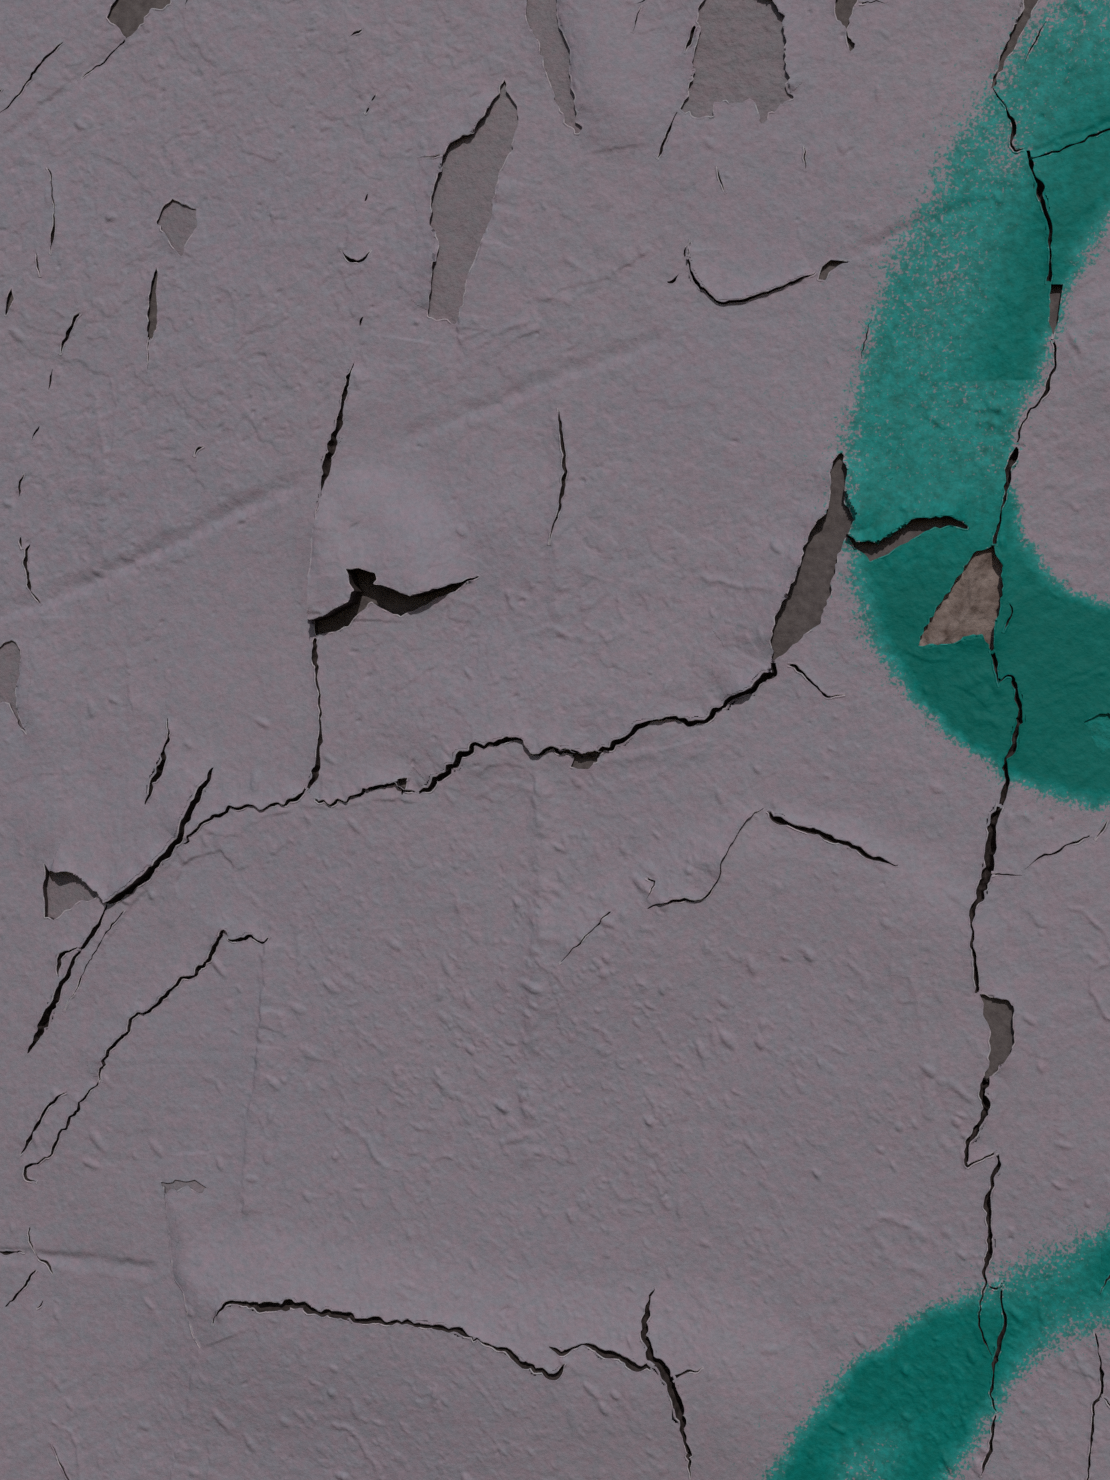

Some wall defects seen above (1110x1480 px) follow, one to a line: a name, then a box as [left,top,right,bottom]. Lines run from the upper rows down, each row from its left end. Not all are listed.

peeling [411,77,520,326]
peeling [655,0,804,160]
crack [991,16,1110,284]
peeling [307,454,481,638]
crack [25,314,846,1057]
peeling [711,450,970,697]
spalling [917,545,1005,688]
peeling [41,840,129,922]
crack [967,673,1110,996]
crack [18,913,271,1184]
crack [162,1186,704,1480]
crack [963,1076,1009,1478]